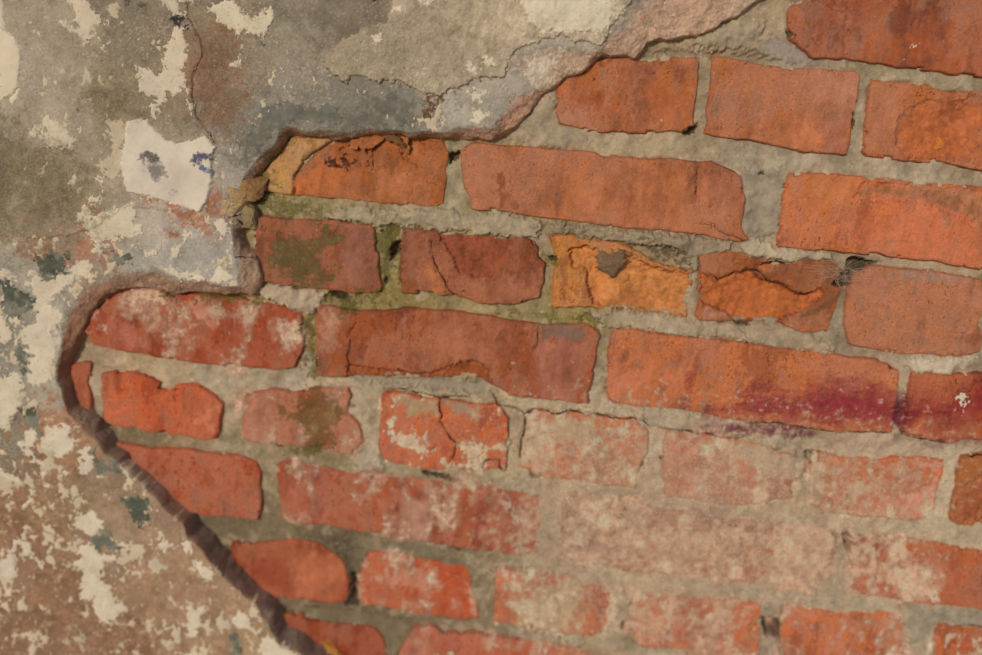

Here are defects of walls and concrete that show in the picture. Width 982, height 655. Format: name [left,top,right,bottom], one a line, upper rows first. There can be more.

spalling [894,94,982,167]
spalling [853,179,982,229]
leakage [118,281,191,357]
leakage [220,295,262,376]
leakage [273,319,310,350]
peeling [0,0,760,655]
spalling [568,245,825,322]
crack [713,260,816,295]
crack [388,388,982,472]
spalling [952,471,982,525]